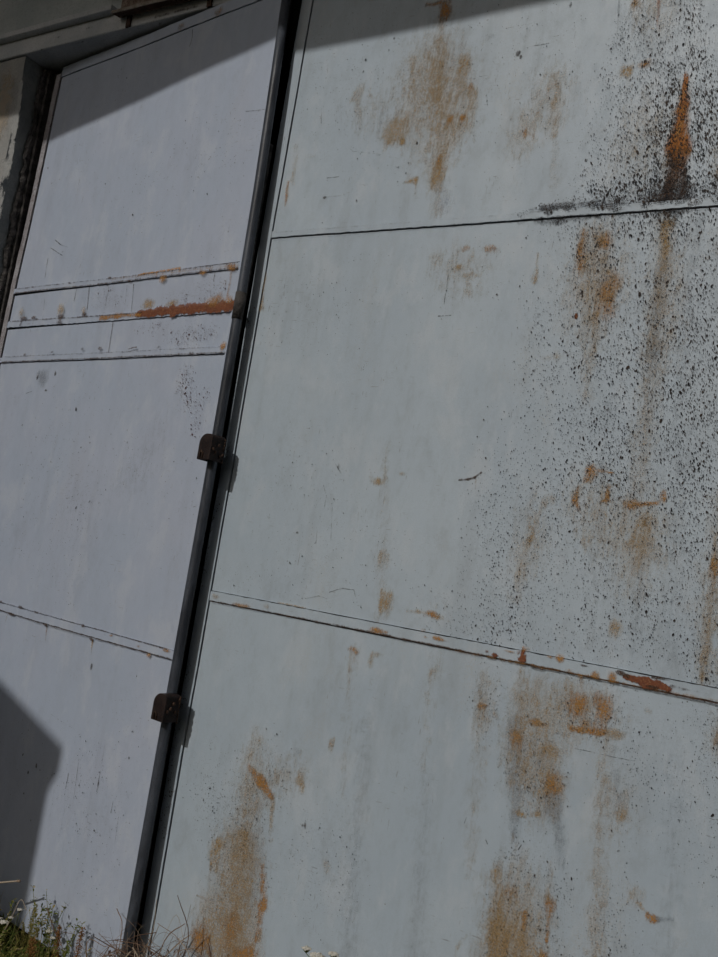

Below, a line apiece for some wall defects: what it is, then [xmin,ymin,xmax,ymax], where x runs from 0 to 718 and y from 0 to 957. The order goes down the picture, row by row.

rust [648,74,692,259]
rust [19,293,234,326]
rust [210,600,718,704]
rust [249,765,273,820]
rust [514,686,621,796]
rust [192,833,267,957]